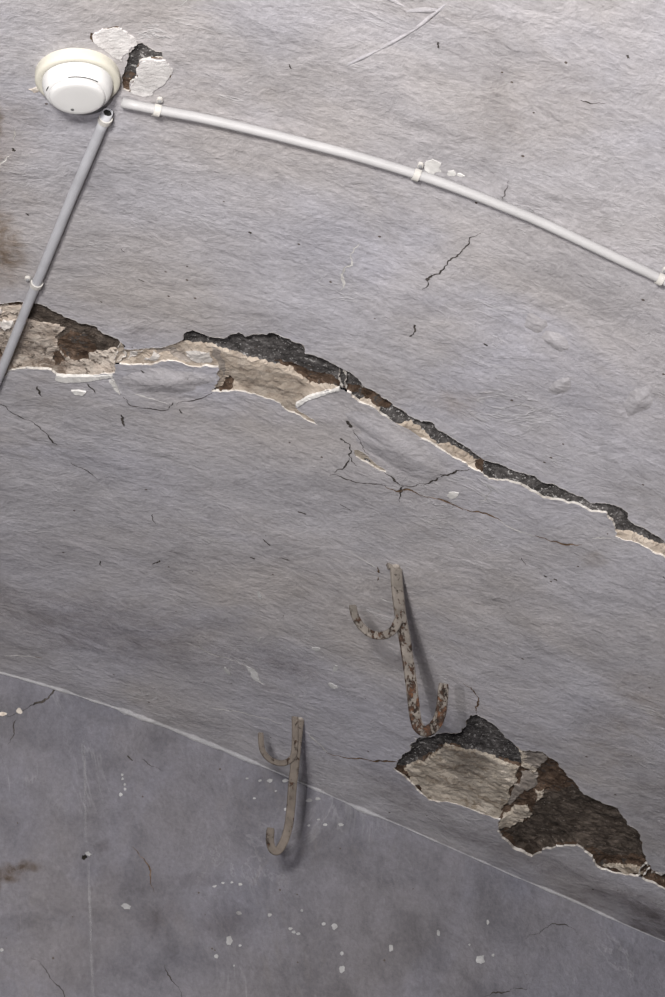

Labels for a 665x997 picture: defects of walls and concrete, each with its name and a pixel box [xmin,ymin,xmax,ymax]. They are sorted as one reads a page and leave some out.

spalling [122,43,163,91]
crack [423,233,480,289]
spalling [0,301,348,425]
spalling [354,450,386,472]
crack [332,368,665,578]
spalling [394,714,651,877]